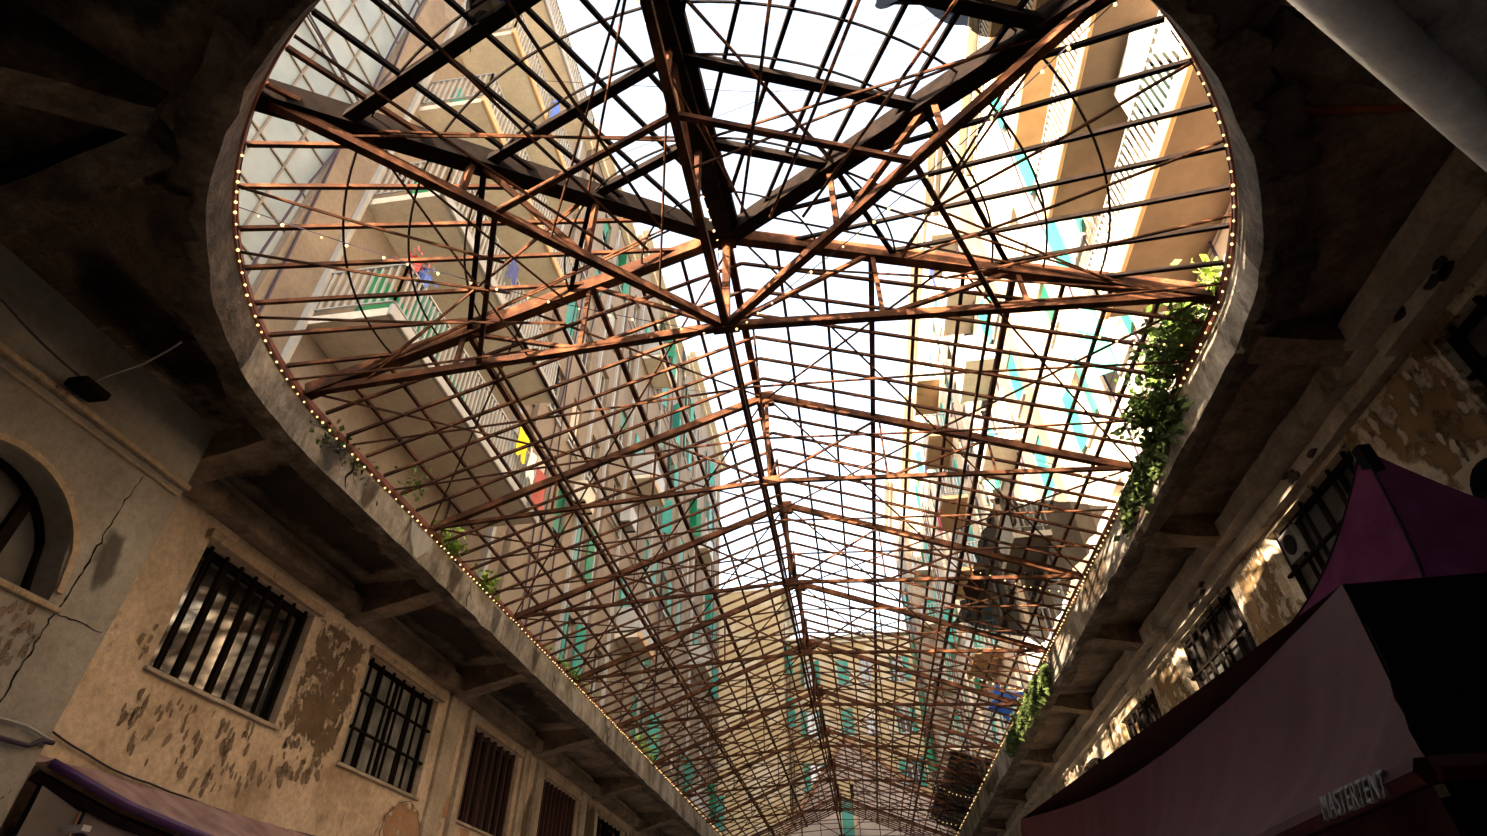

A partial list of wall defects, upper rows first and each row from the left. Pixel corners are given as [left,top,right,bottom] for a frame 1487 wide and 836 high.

peeling [1355,336,1487,477]
peeling [1237,545,1297,643]
peeling [117,620,367,798]